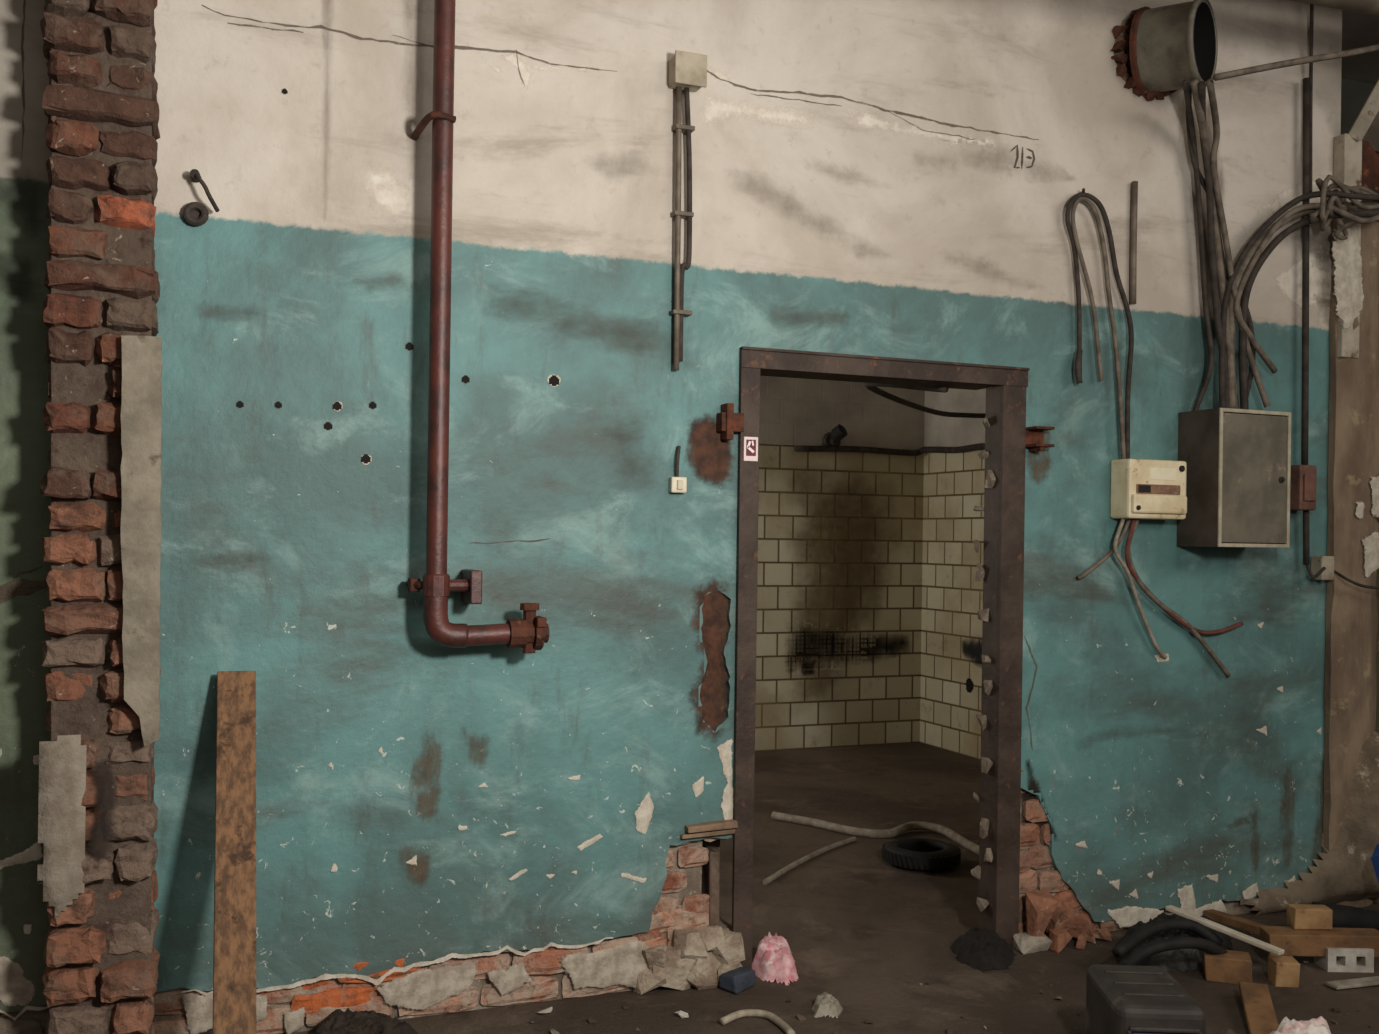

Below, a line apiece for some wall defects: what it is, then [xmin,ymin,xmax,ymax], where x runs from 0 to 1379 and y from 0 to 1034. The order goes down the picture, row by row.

crack [202,5,617,87]
crack [707,70,1039,140]
corrosion [688,417,732,484]
flaking render [256,581,745,1034]
flaking render [1019,636,1226,953]
peeling [0,842,43,869]
peeling [1242,882,1258,899]
peeling [0,956,49,1034]
flaking render [154,988,213,1034]